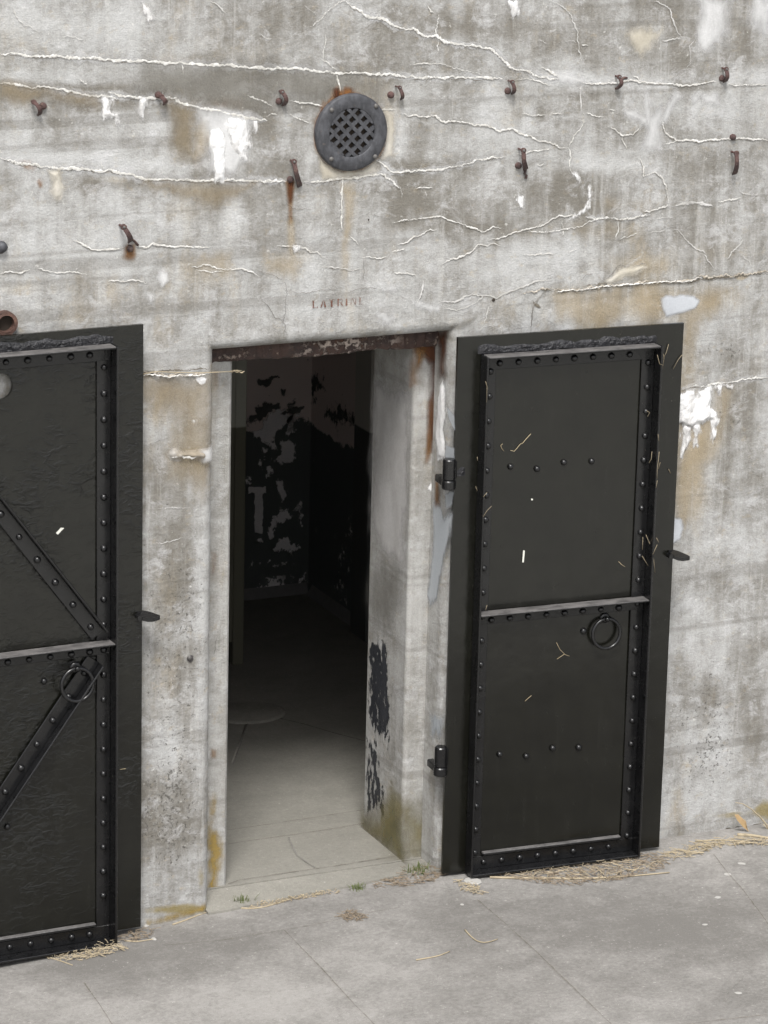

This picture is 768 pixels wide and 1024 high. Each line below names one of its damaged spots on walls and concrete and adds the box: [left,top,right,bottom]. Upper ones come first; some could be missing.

crack [0,0,768,336]
spalling [523,270,768,308]
peeling [246,373,326,588]
corrosion [415,332,446,458]
peeling [366,640,390,818]